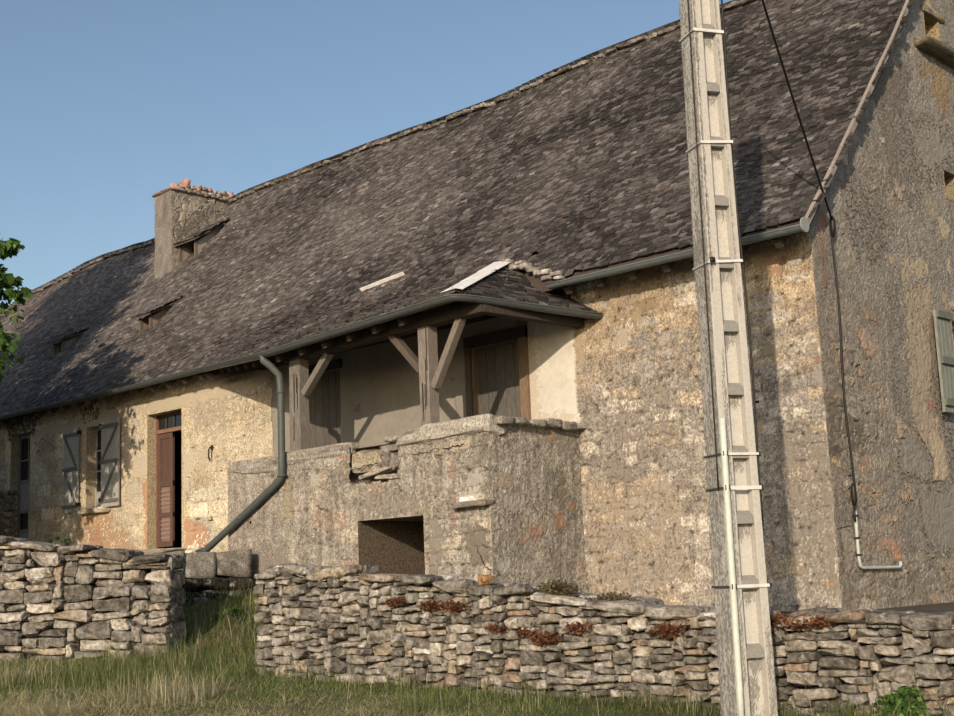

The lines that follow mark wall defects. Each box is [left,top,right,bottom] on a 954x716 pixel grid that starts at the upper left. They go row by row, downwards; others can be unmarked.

spalling [873,60,914,114]
flaking render [889,251,952,489]